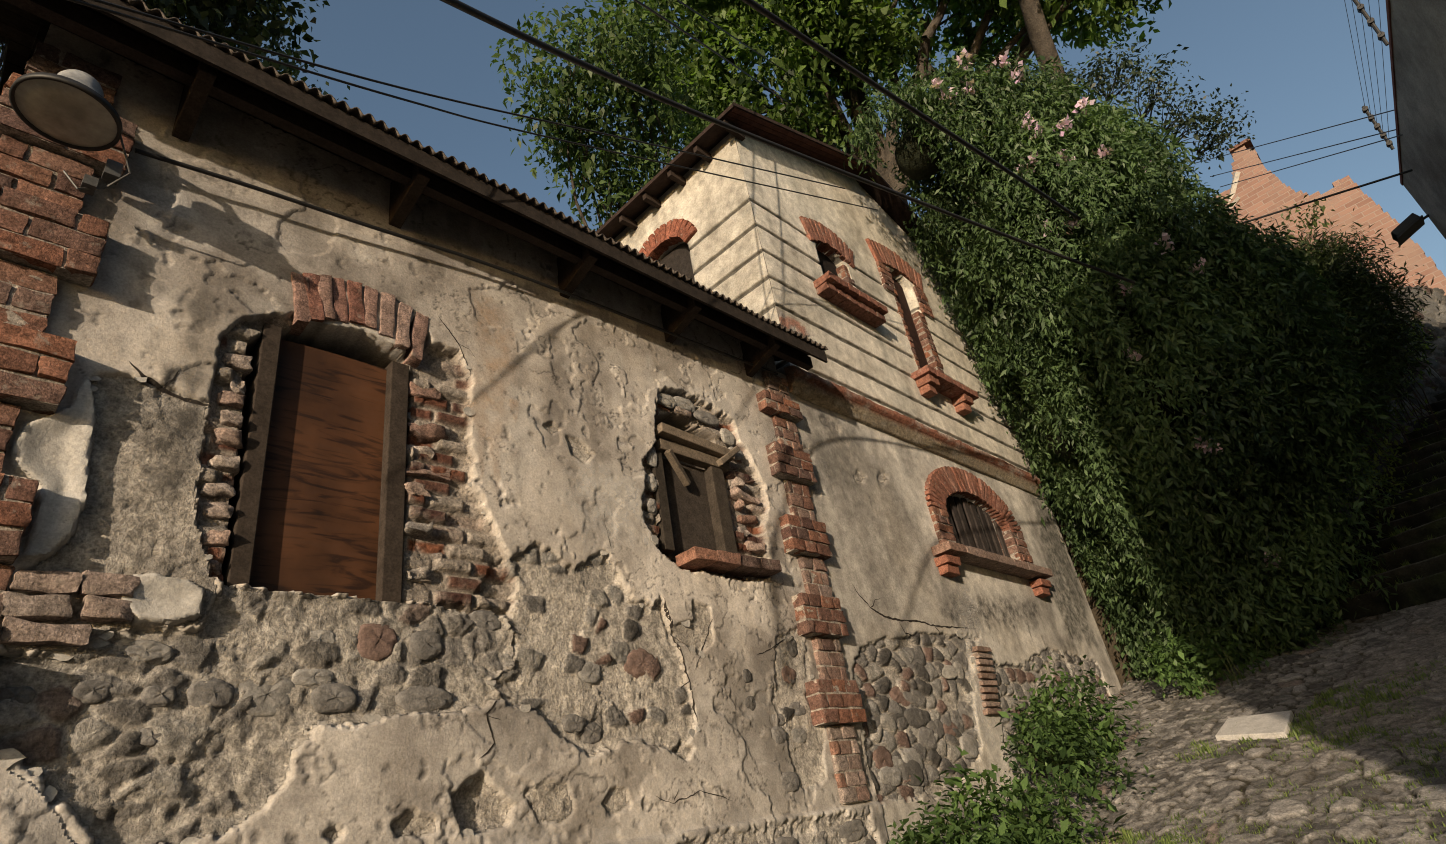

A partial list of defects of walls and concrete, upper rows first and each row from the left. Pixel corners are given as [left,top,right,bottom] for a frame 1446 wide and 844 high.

flaking render [0,316,713,844]